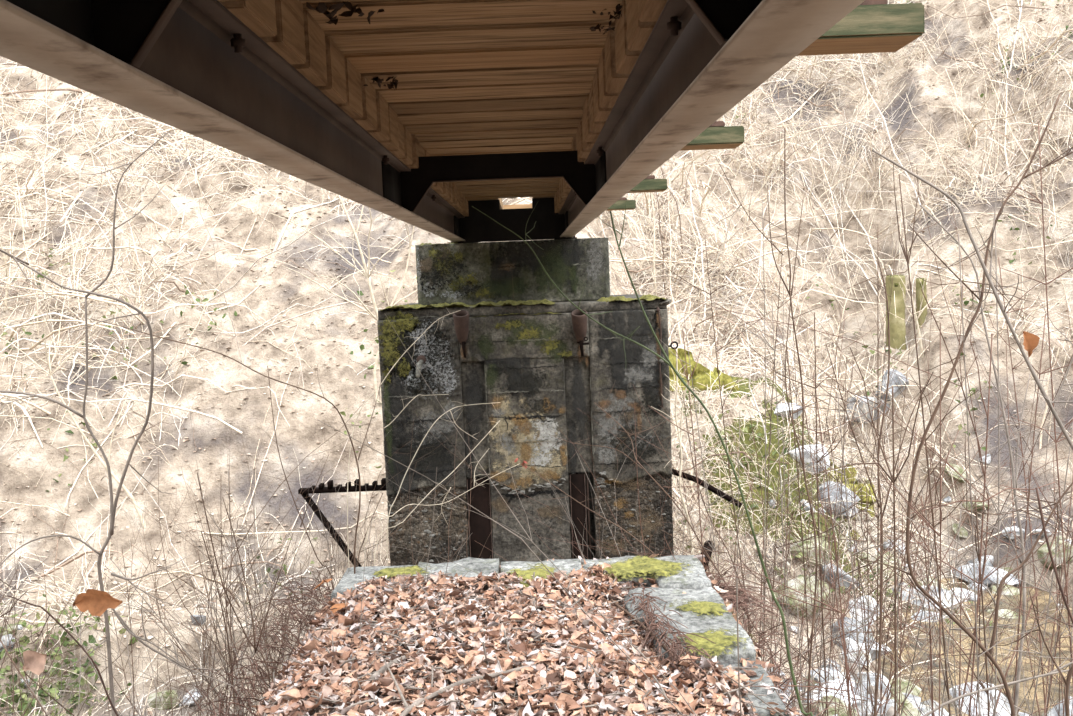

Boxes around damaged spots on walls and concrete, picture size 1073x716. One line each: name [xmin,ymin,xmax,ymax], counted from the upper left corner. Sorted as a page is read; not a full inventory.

damp [417,248,465,299]
peeling [401,320,459,401]
damp [383,301,669,496]
rust [490,413,567,488]